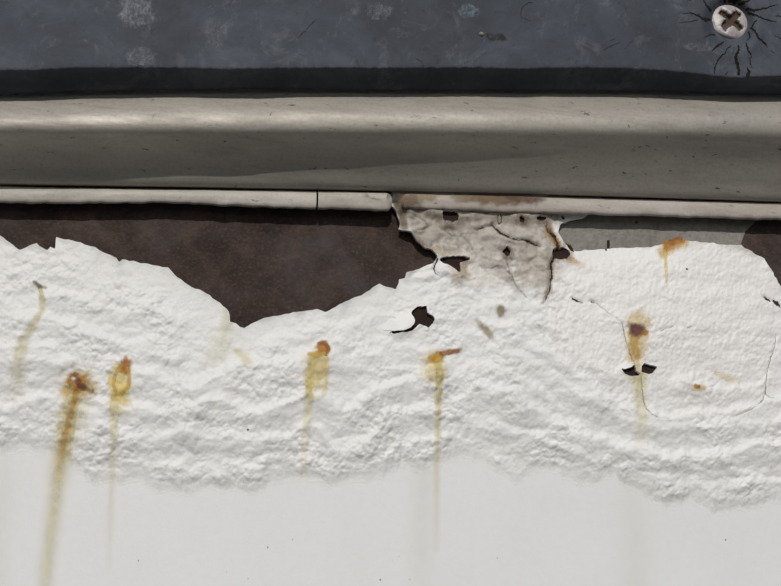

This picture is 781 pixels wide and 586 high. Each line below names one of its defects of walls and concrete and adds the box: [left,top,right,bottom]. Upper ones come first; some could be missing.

crack [679,0,781,77]
peeling [0,190,437,328]
crack [448,214,560,303]
peeling [559,214,781,286]
rust [664,237,685,265]
rust [60,374,87,456]
rust [109,358,131,414]
rust [308,341,330,387]
peeling [380,312,415,331]
rust [428,349,460,379]
rust [628,312,649,379]